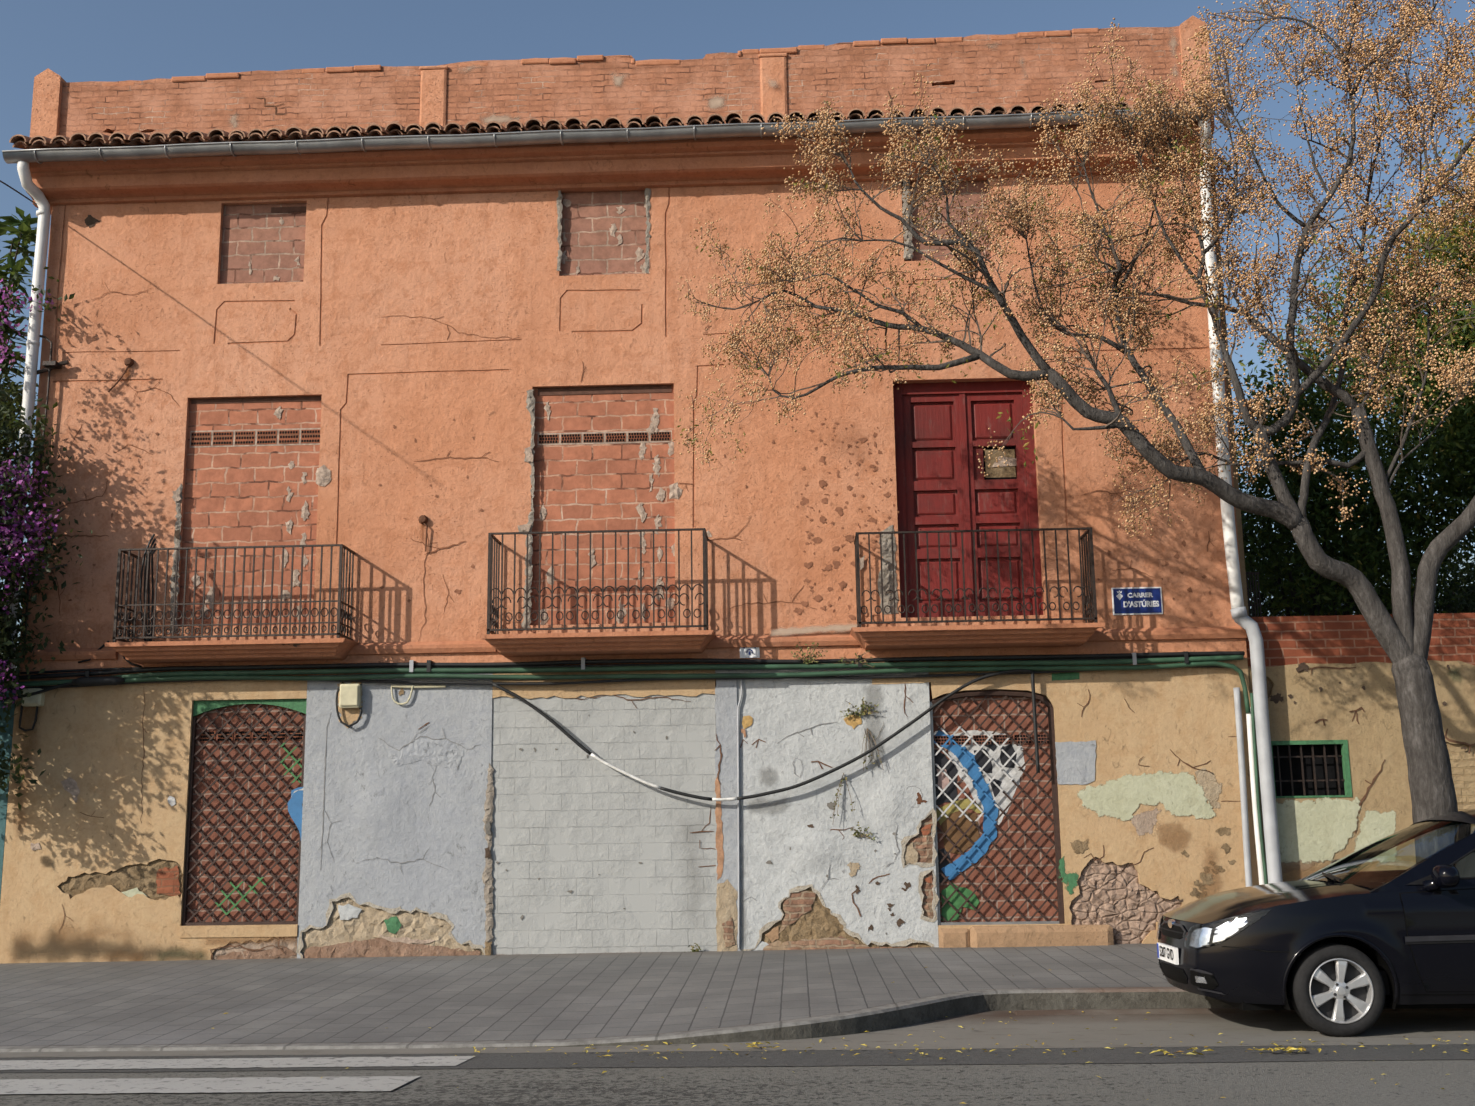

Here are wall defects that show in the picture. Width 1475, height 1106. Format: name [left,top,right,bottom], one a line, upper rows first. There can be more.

crack [386,315,519,339]
crack [125,378,177,403]
crack [411,523,465,641]
flaking render [1446,742,1475,834]
flaking render [59,859,183,900]
flaking render [212,763,507,960]
flaking render [715,777,939,951]
flaking render [1058,768,1236,944]